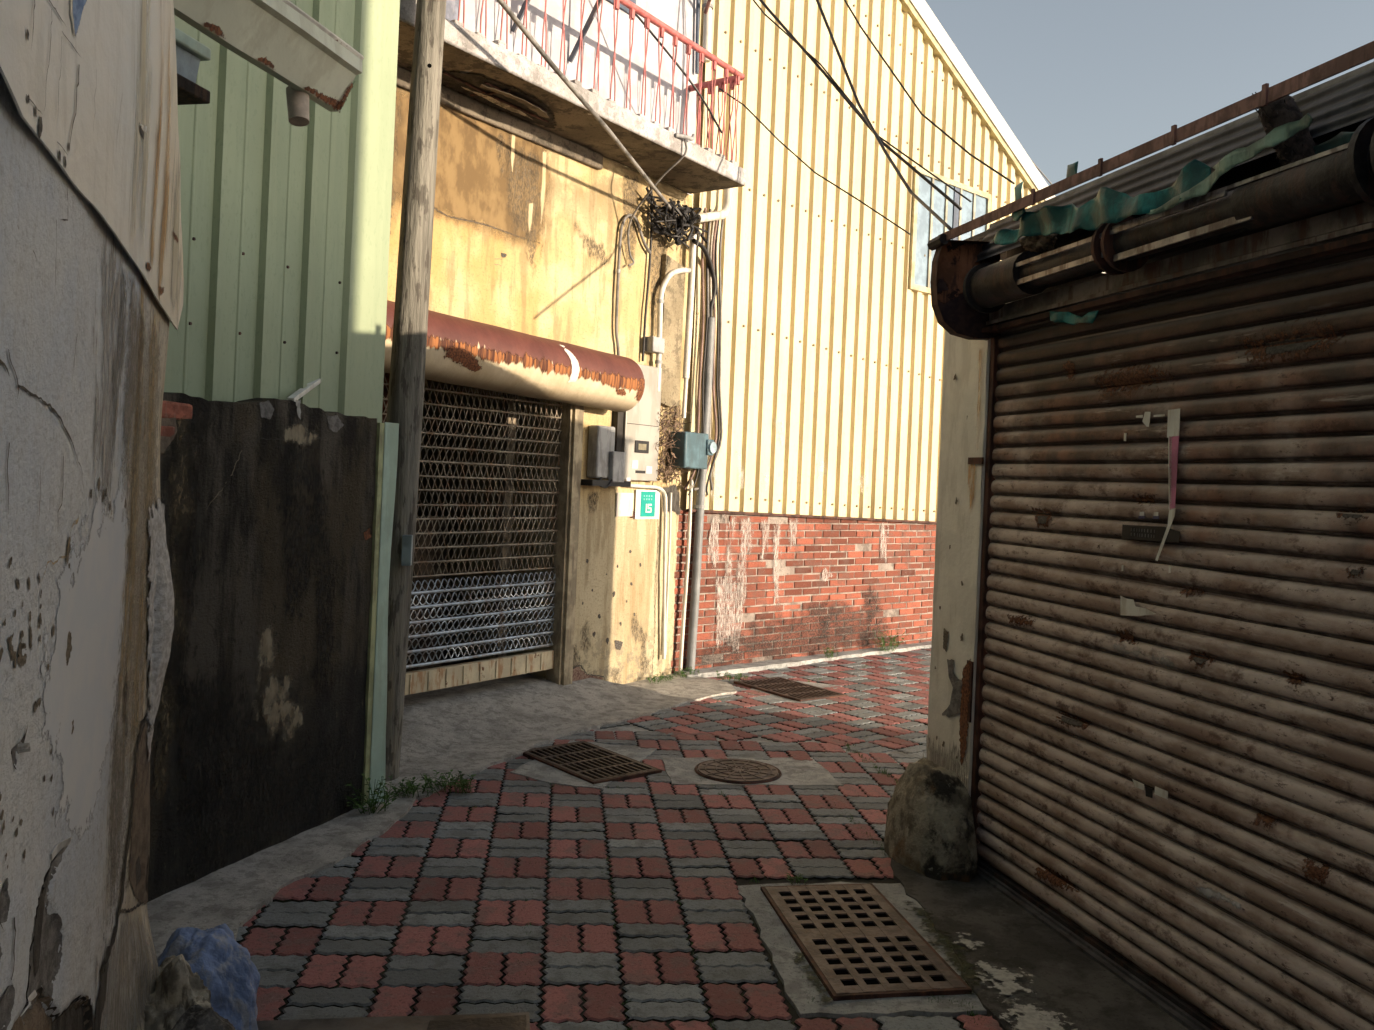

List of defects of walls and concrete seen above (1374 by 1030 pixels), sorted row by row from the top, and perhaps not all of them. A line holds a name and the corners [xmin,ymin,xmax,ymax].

peeling [70,0,87,35]
rust [304,82,354,112]
rust [426,335,645,401]
rust [936,278,994,409]
crack [0,349,99,520]
leakage [93,236,200,923]
leakage [683,513,889,668]
peeling [11,698,42,769]
flaking render [256,626,303,739]
rust [959,660,971,766]
crack [100,676,151,984]
flaking render [0,792,159,1030]